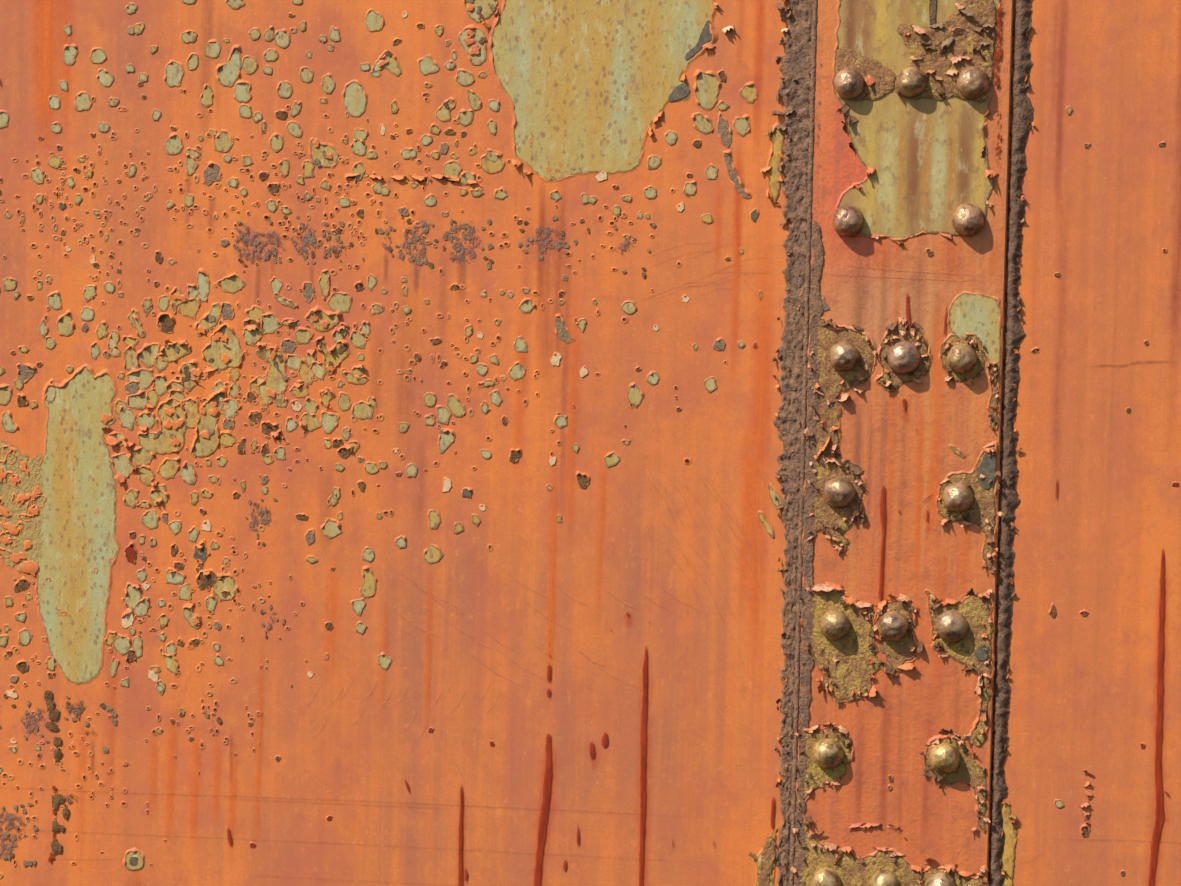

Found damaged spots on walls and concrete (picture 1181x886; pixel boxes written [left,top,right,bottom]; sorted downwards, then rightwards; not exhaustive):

peeling [30,0,798,222]
peeling [831,0,1003,257]
peeling [0,268,419,699]
peeling [423,392,467,454]
peeling [423,477,486,565]
peeling [469,335,528,426]
peeling [868,594,923,677]
rust [458,786,467,886]
rust [534,734,552,886]
rust [639,648,647,886]
rust [757,797,776,886]
rust [1148,550,1169,886]